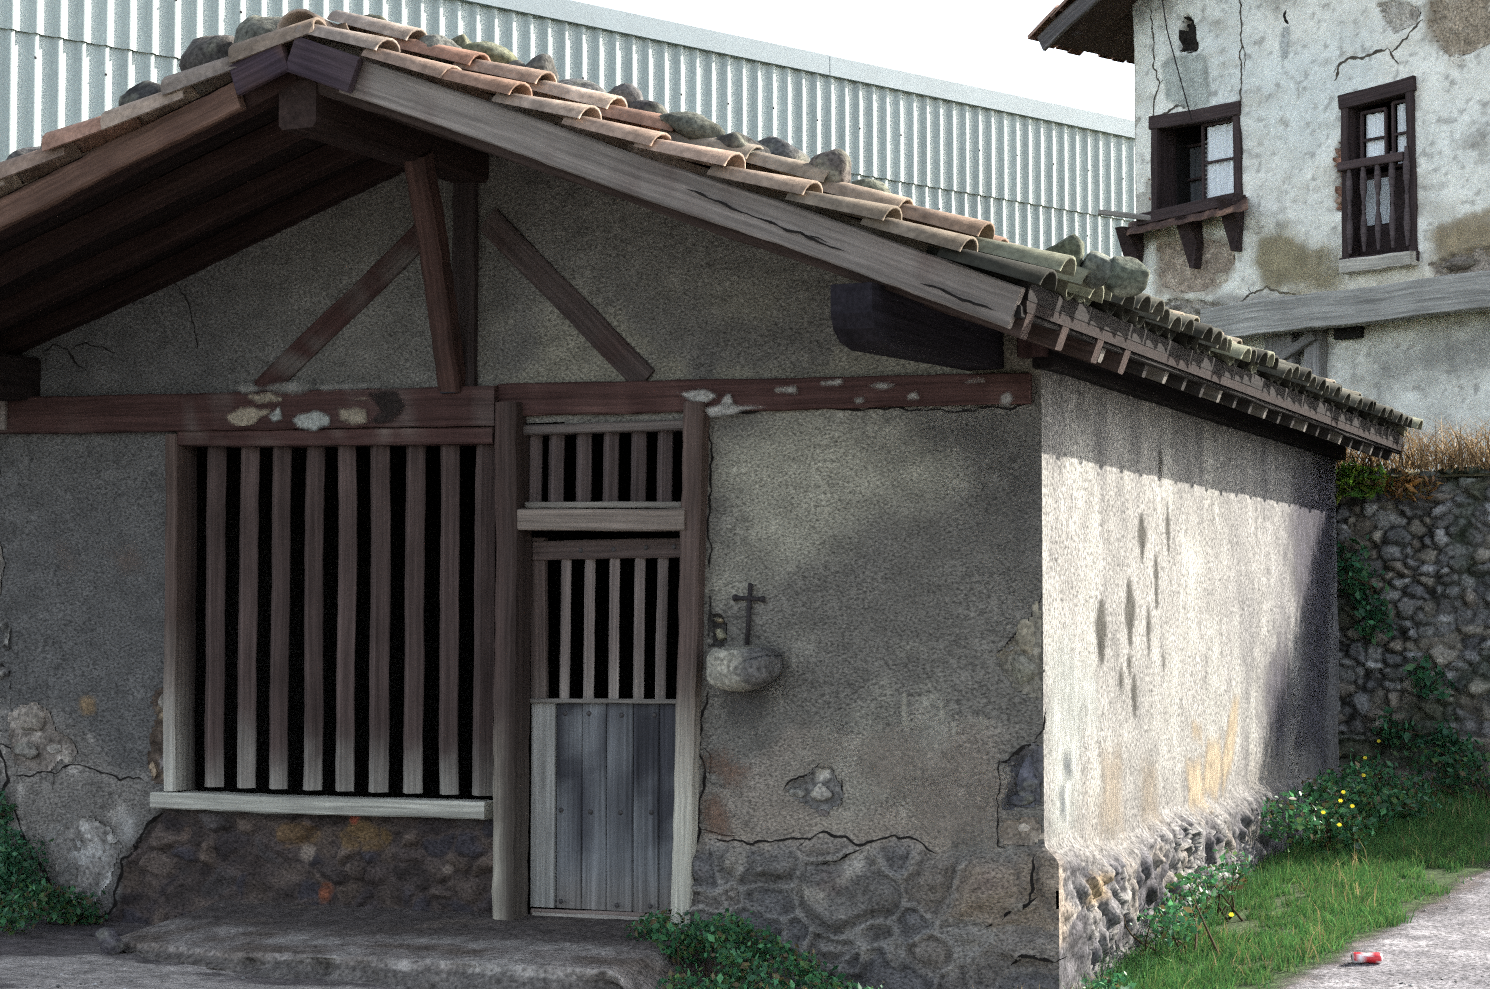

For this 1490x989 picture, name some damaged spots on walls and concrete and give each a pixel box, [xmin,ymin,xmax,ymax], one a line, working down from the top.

crack [1150,8,1187,116]
crack [1334,19,1423,81]
spalling [1377,0,1490,66]
spalling [1156,240,1235,318]
peeling [227,383,404,430]
peeling [683,390,753,416]
leakage [1097,601,1107,662]
leakage [1120,516,1158,713]
crack [0,743,144,883]
crack [697,692,938,865]
spalling [1000,743,1044,846]
crack [97,812,164,919]